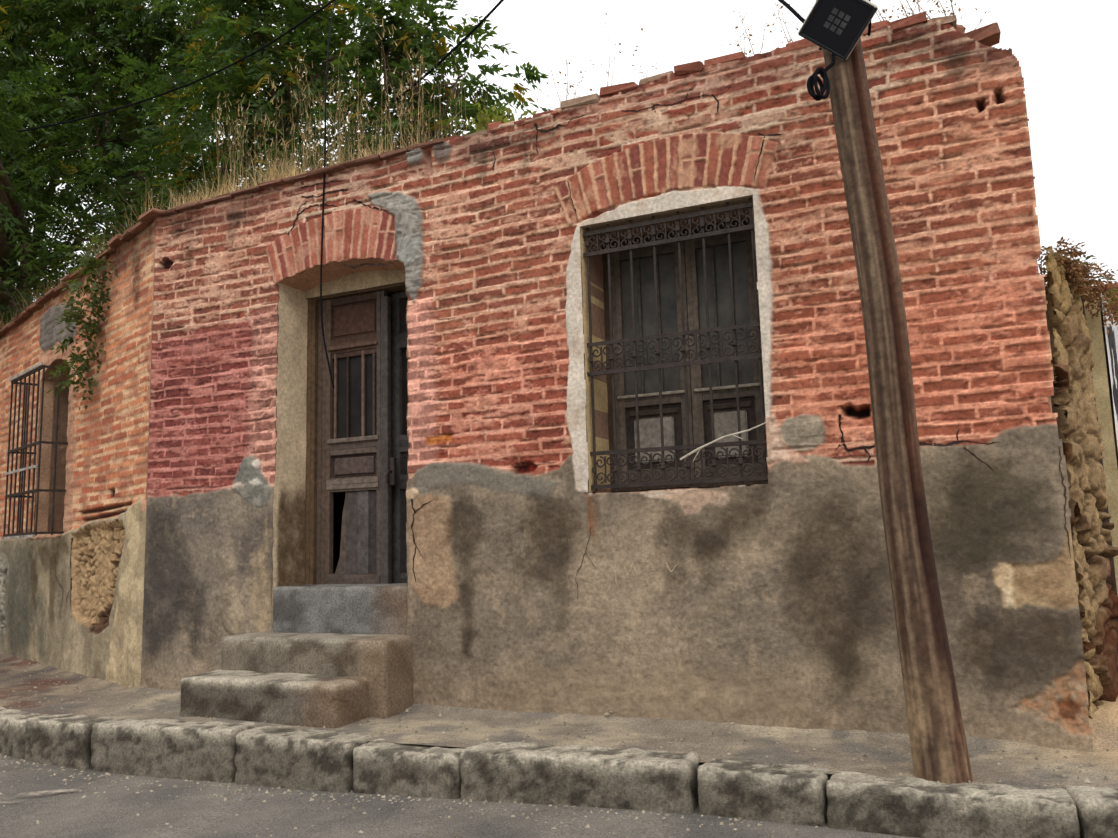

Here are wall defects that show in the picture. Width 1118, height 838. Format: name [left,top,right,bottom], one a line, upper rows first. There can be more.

crack [621,84,719,113]
crack [534,115,584,153]
crack [287,179,391,235]
crack [342,262,394,270]
crack [836,414,875,463]
crack [919,430,997,471]
crack [411,499,435,582]
water stain [532,501,576,572]
flaking render [71,518,125,634]
water stain [791,505,876,685]